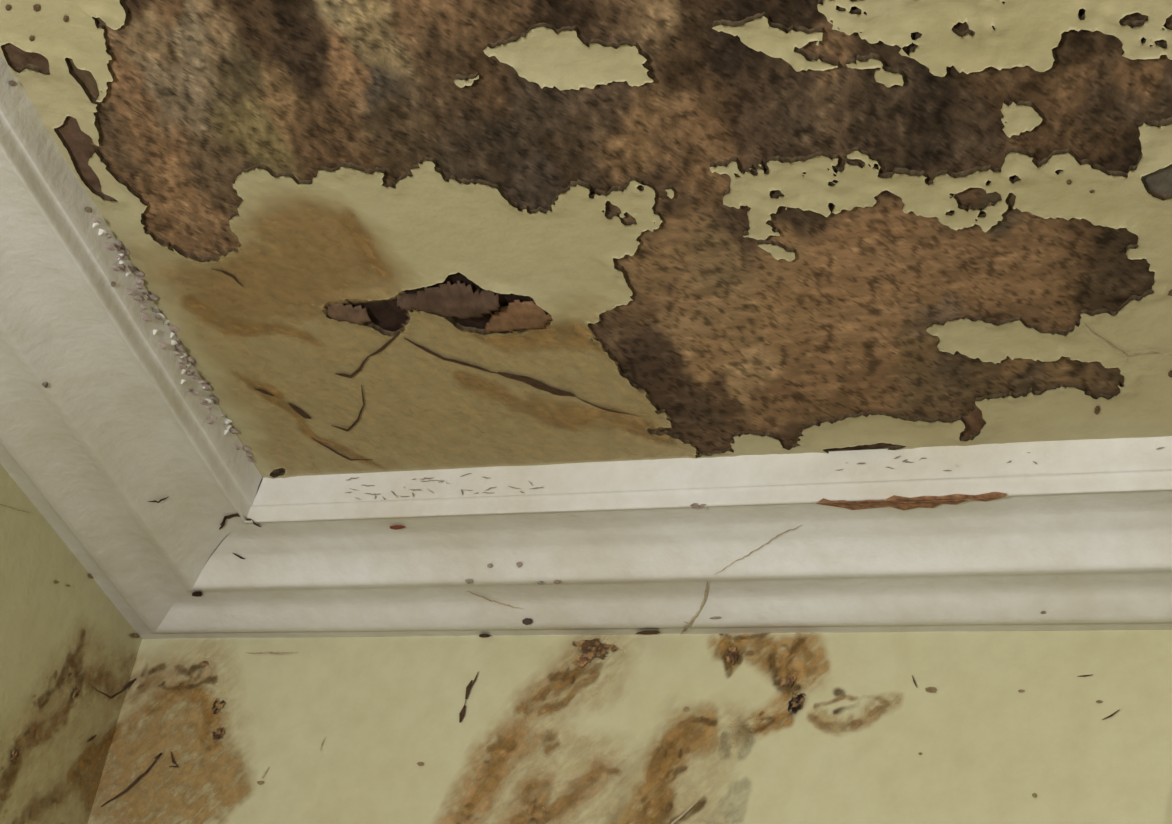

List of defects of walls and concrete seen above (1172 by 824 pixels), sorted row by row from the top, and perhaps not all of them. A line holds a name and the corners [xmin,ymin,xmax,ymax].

peeling [57,0,1172,463]
crack [254,328,639,500]
crack [681,525,801,634]
corrosion [816,492,1007,510]
leakage [0,631,250,824]
leakage [442,638,619,824]
leakage [620,633,900,824]